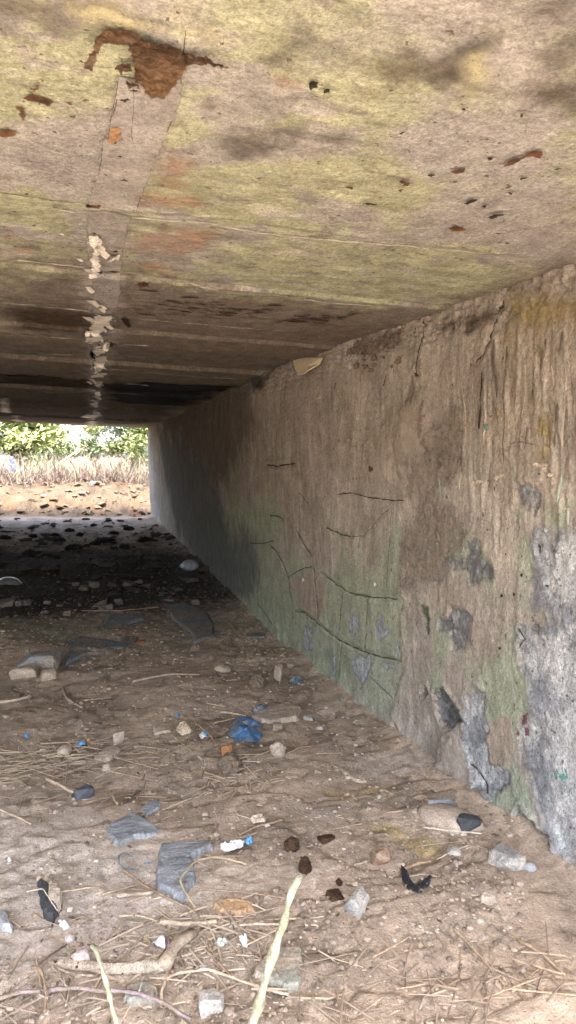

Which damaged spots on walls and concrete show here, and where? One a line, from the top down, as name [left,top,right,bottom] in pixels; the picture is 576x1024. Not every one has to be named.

corrosion [504,151,543,167]
crack [253,492,405,699]
spalling [424,525,576,866]